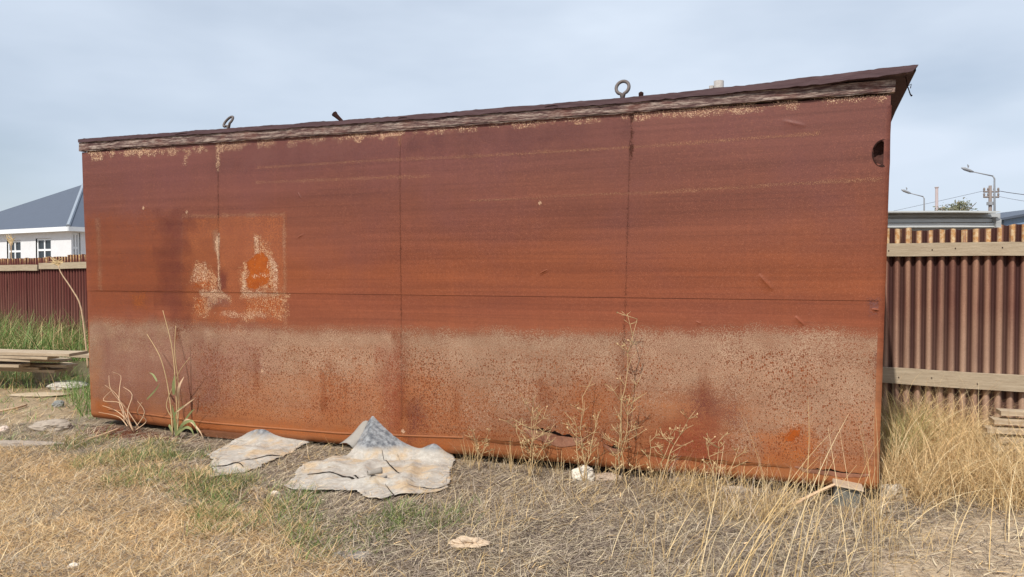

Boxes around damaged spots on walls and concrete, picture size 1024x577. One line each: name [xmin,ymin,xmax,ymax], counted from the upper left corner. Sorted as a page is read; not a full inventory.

peeling [613,94,888,122]
peeling [87,117,601,166]
peeling [186,233,291,323]
rust [181,415,355,441]
rust [393,431,454,452]
rust [554,342,738,473]